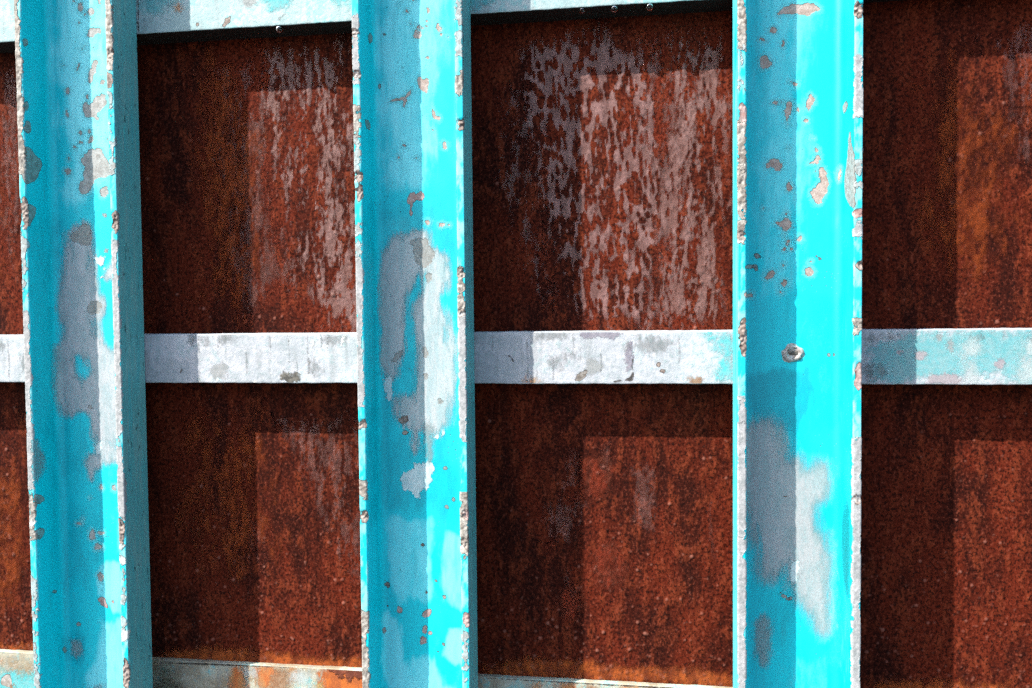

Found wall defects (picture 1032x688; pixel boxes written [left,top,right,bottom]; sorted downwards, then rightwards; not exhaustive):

peeling [64,0,114,197]
rust [199,58,260,308]
spalling [737,120,747,247]
peeling [809,132,856,208]
rust [924,98,1015,273]
peeling [54,220,117,491]
peeling [378,220,466,498]
rust [0,468,26,603]
peeling [746,419,831,635]
rust [162,647,363,688]
rust [483,657,733,688]
rust [876,679,1007,688]